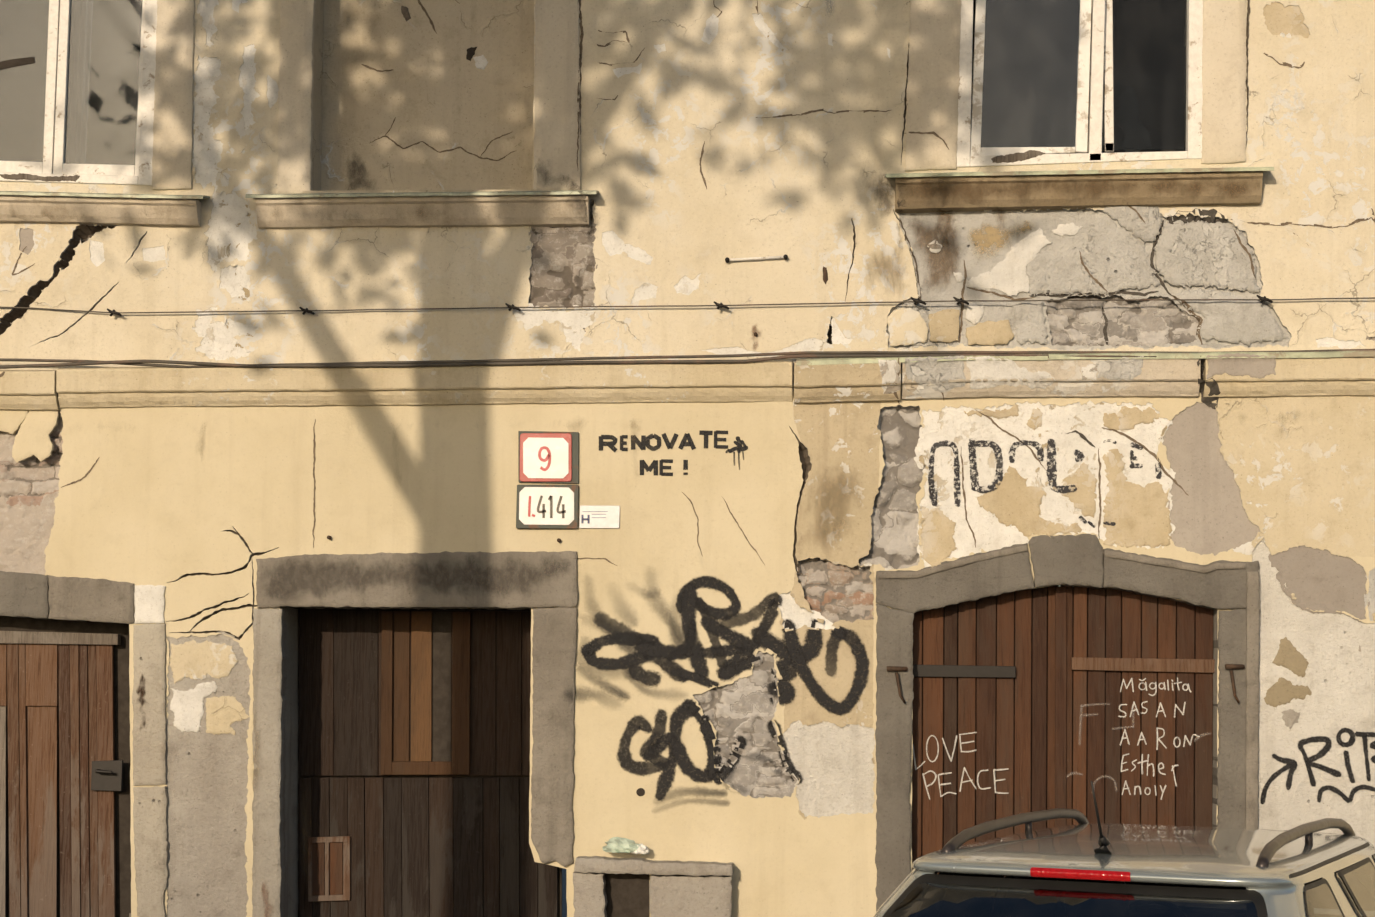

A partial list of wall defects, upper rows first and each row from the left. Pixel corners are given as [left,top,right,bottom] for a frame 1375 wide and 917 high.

crack [577,0,645,168]
crack [1246,0,1305,144]
peeling [191,0,258,361]
crack [0,225,144,342]
flaking render [511,199,653,351]
flaking render [0,410,63,575]
crack [167,528,277,640]
crack [310,419,318,548]
crack [682,426,812,573]
peeling [778,209,1375,847]
peeling [166,631,251,917]
flaking render [693,650,876,820]